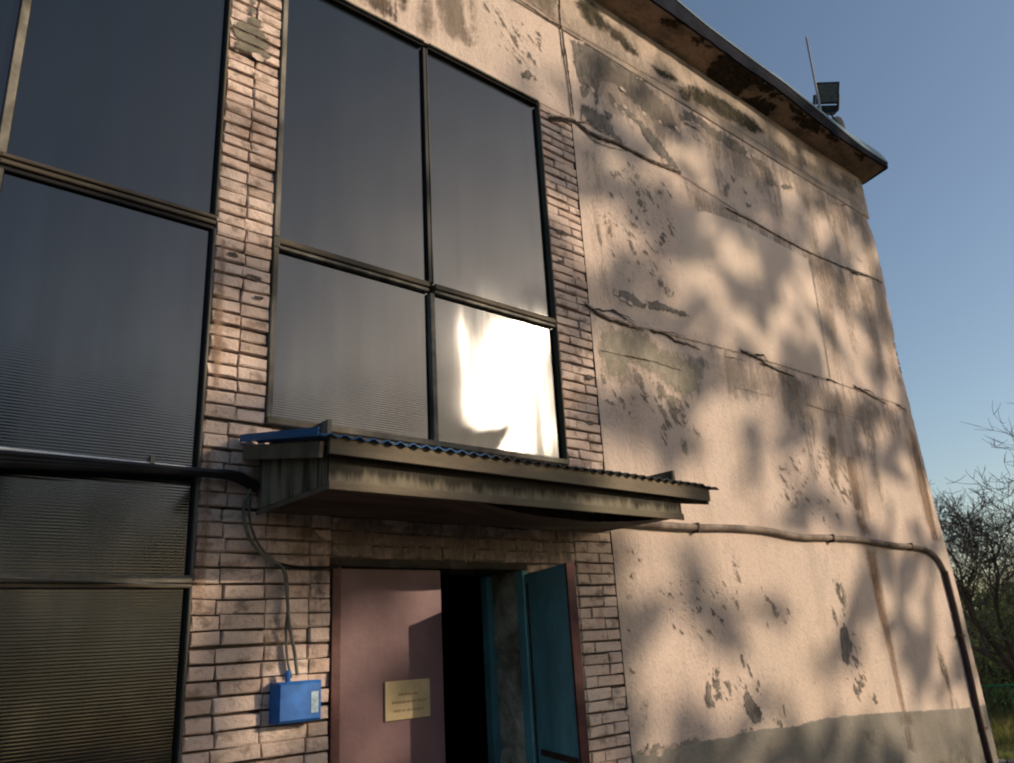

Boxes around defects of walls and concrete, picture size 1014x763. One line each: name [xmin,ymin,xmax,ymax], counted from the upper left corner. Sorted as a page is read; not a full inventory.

leakage [369,0,407,22]
leakage [423,0,472,43]
crack [511,0,682,174]
peeling [571,40,795,189]
leakage [654,68,764,133]
peeling [691,36,841,144]
crack [601,350,682,371]
crack [584,301,700,351]
leakage [599,326,705,412]
crack [727,348,907,421]
peeling [831,580,867,701]
peeling [704,654,786,732]